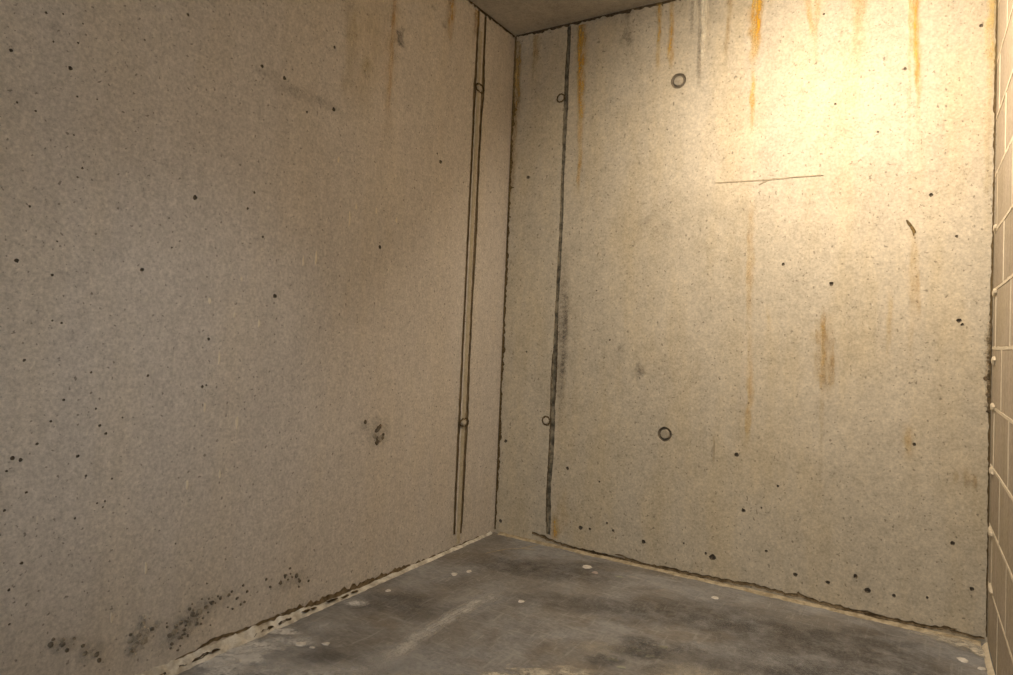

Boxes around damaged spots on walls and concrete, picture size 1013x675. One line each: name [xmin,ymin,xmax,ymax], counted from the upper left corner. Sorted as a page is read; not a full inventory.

rust [752,0,762,40]
damp [196,628,345,675]
damp [482,667,590,675]